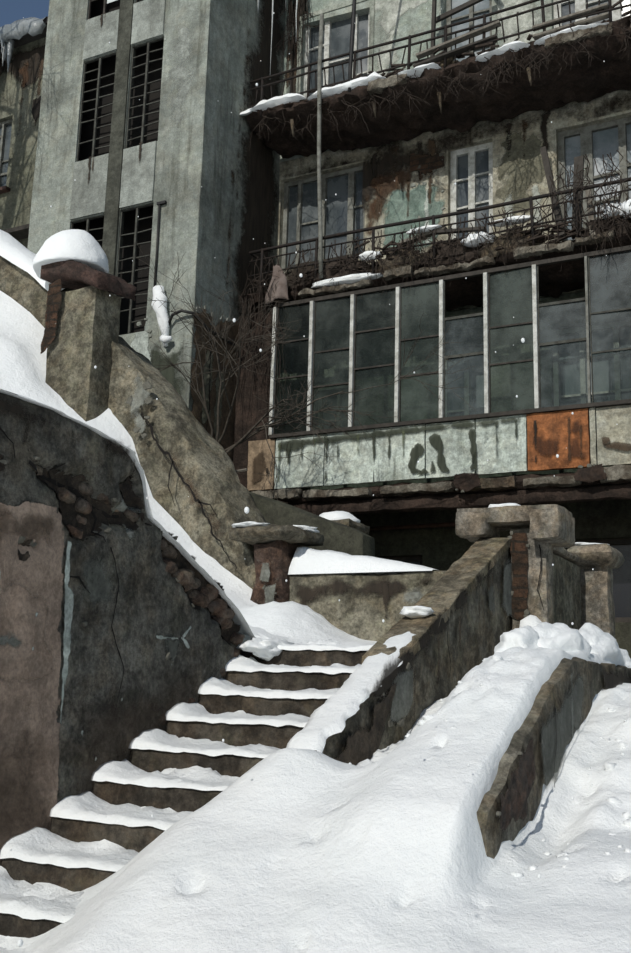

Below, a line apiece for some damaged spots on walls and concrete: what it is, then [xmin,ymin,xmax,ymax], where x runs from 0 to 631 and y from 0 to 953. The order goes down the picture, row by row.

flaking render [497,0,540,46]
peeling [383,153,445,251]
crack [140,405,237,569]
water stain [252,417,520,483]
rust [533,417,585,462]
water stain [602,437,631,451]
spalling [161,531,245,657]
flaking render [0,456,145,864]